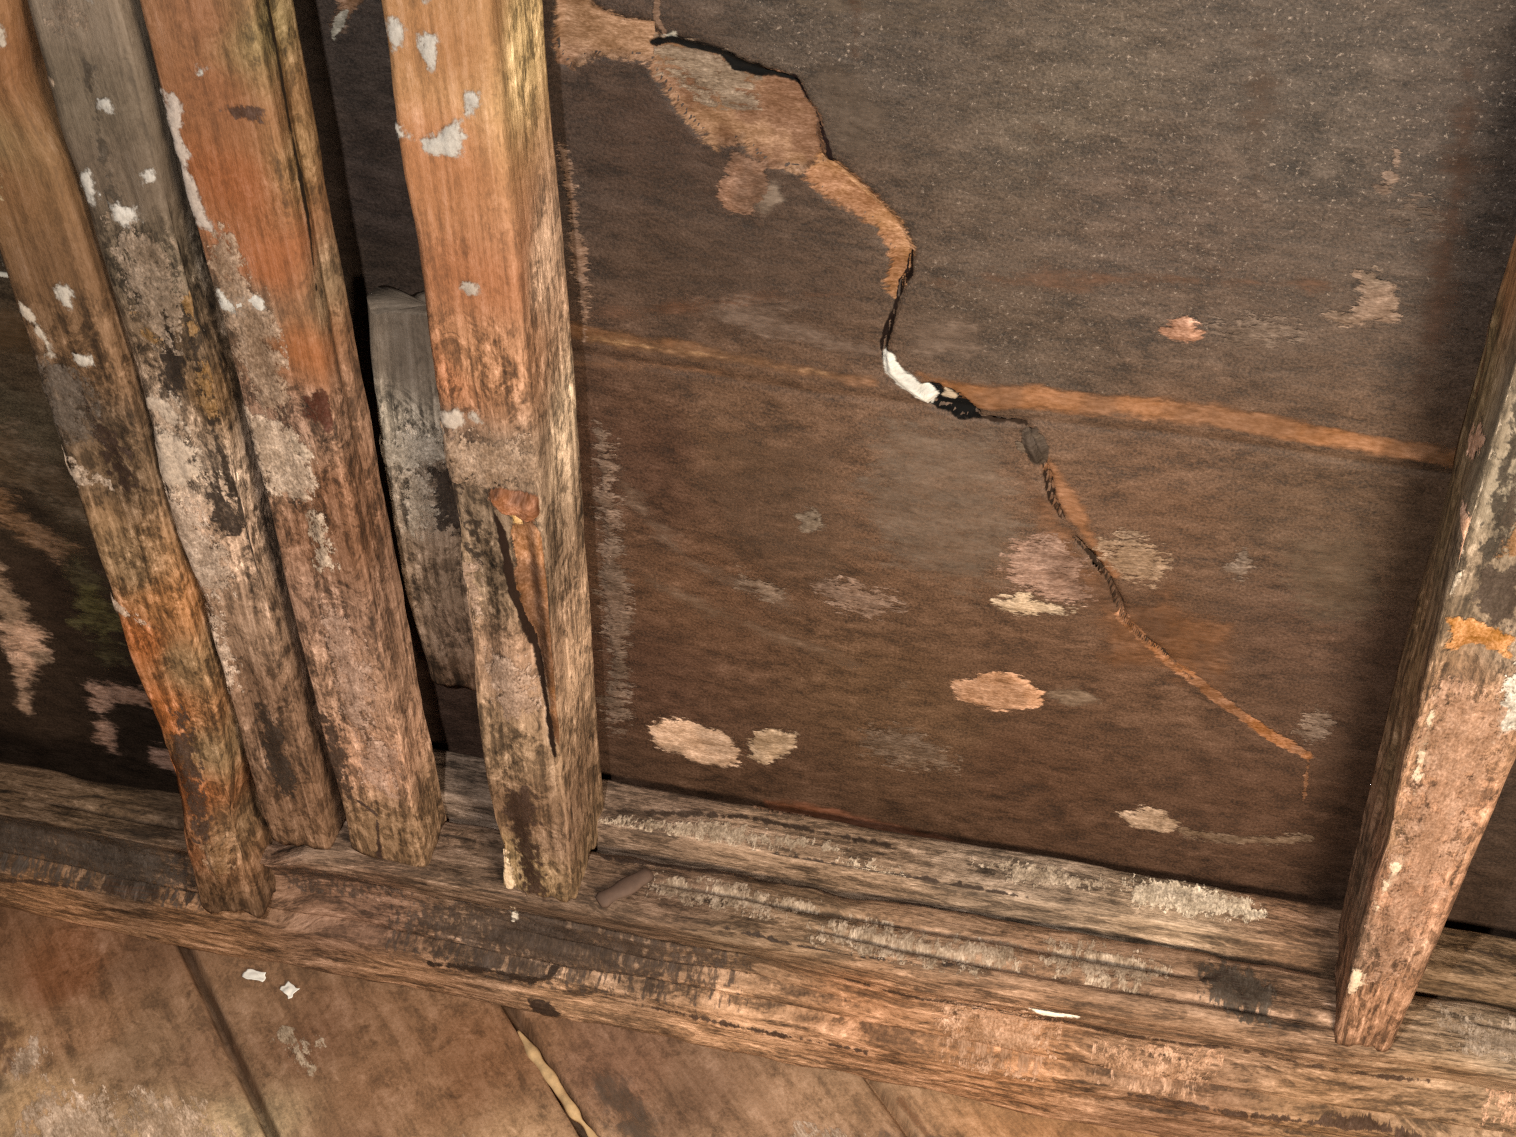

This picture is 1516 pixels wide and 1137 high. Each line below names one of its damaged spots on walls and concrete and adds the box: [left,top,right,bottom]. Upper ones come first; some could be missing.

peeling [554,142,593,342]
spalling [552,0,915,299]
crack [650,0,834,161]
crack [880,249,914,360]
peeling [582,420,798,768]
peeling [950,671,1097,712]
crack [977,410,1313,799]